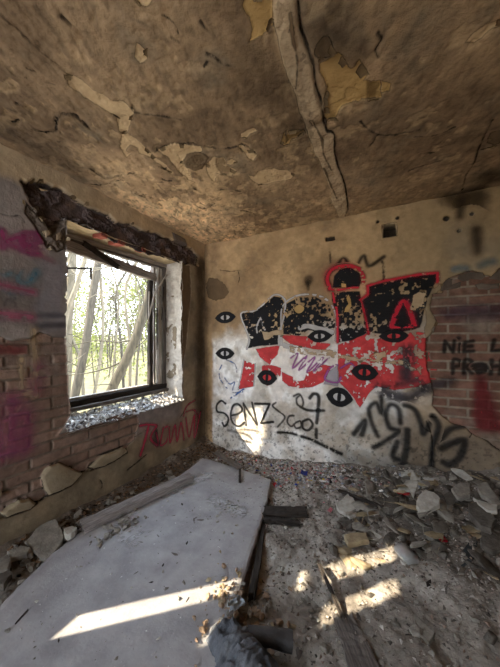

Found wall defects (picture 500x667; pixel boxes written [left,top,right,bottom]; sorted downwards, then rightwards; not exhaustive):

peeling [242,0,274,41]
crack [41,112,89,133]
peeling [63,74,202,183]
peeling [239,128,258,161]
crack [297,0,349,207]
peeling [314,36,391,121]
crack [359,120,434,145]
peeling [248,168,295,186]
flaking render [22,200,71,252]
peeling [205,278,229,301]
flaking render [409,268,500,450]
flaking render [0,332,139,518]